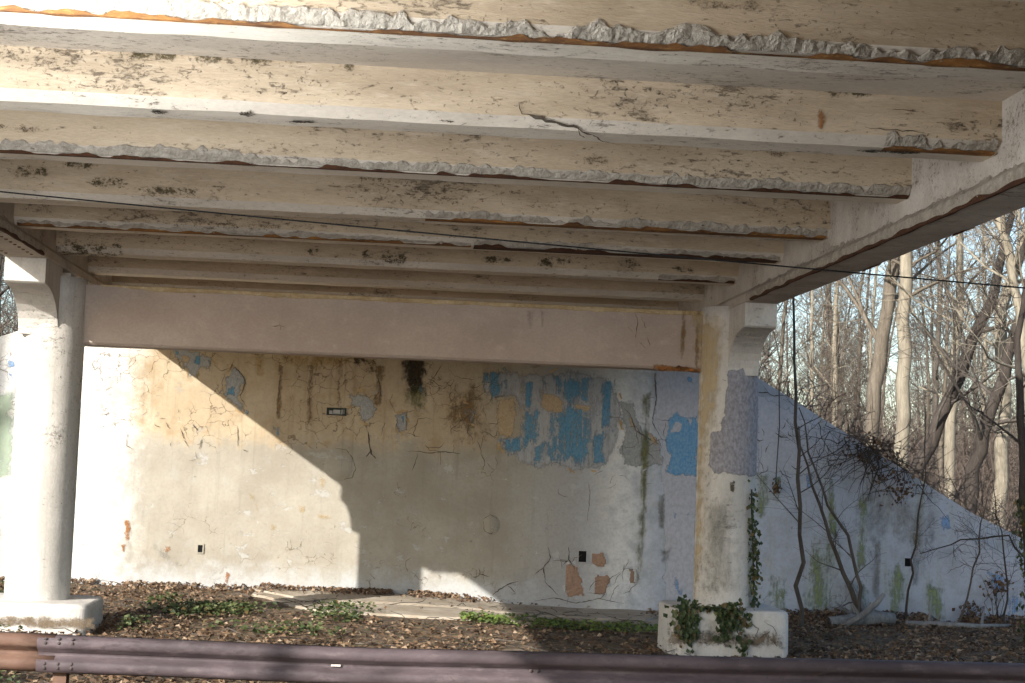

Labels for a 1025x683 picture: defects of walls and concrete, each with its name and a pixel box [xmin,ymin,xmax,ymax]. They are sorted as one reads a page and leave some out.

spalling [0,0,1025,72]
spalling [0,138,911,199]
crack [519,104,620,145]
spalling [857,130,999,156]
spalling [0,162,1025,300]
peeling [173,350,216,378]
crack [220,361,247,451]
peeling [220,364,249,414]
leakage [401,360,426,406]
crack [339,365,507,479]
peeling [482,368,920,601]
crack [474,548,634,604]